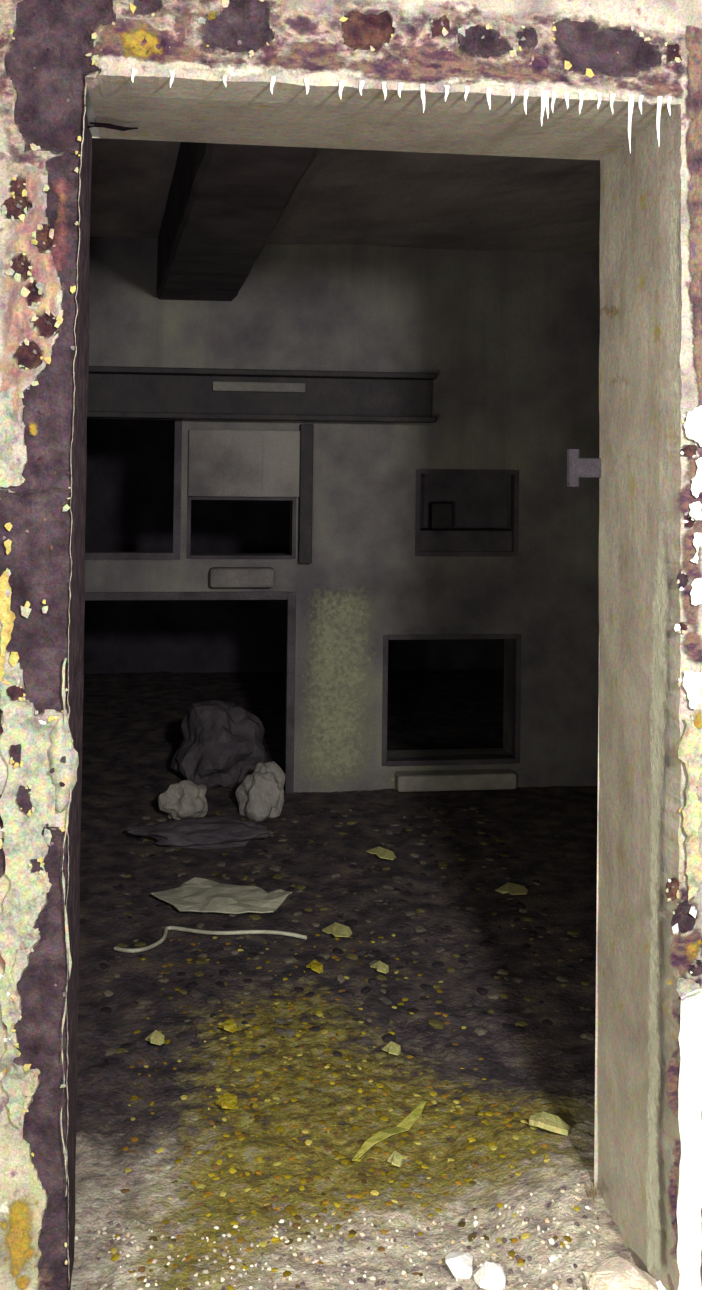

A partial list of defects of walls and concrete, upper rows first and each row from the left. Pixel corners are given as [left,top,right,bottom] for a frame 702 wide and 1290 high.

spalling [187,0,290,67]
damp [169,65,310,95]
corrosion [88,0,576,86]
damp [338,72,404,100]
damp [444,78,470,102]
spalling [424,3,686,90]
damp [486,84,672,153]
corrosion [600,25,702,407]
peeling [676,405,702,606]
corrosion [679,439,702,662]
spalling [0,0,115,1290]
corrosion [667,1140,680,1259]